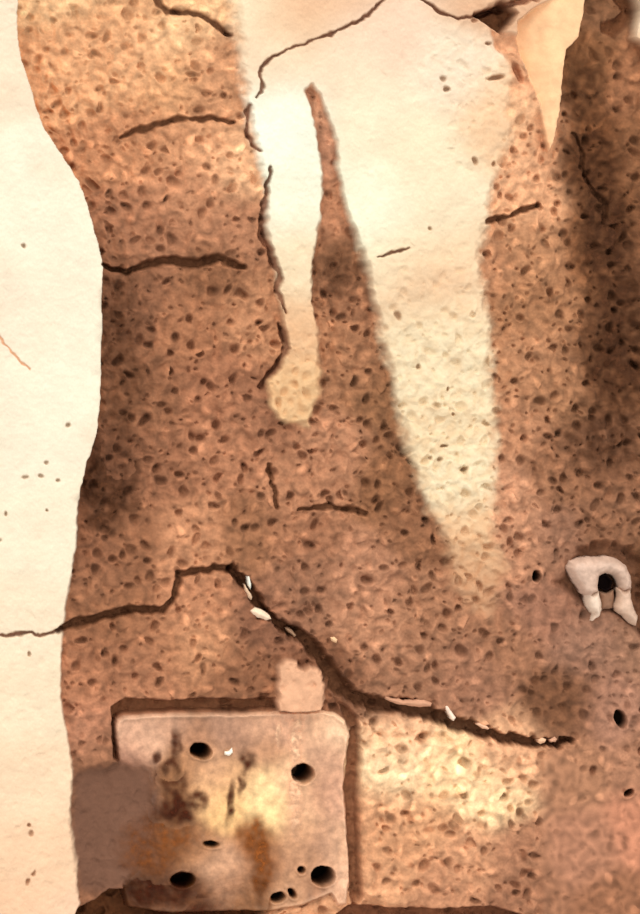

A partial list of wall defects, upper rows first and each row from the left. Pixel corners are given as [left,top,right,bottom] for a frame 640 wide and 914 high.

crack [421,0,540,20]
crack [101,0,386,390]
flaking render [243,73,324,427]
crack [485,202,541,224]
flaking render [368,271,509,617]
rust [130,872,189,914]
rust [153,734,207,822]
spalling [60,571,325,827]
rust [228,778,245,816]
rust [246,819,271,891]
crack [0,562,576,750]
spalling [205,702,544,914]